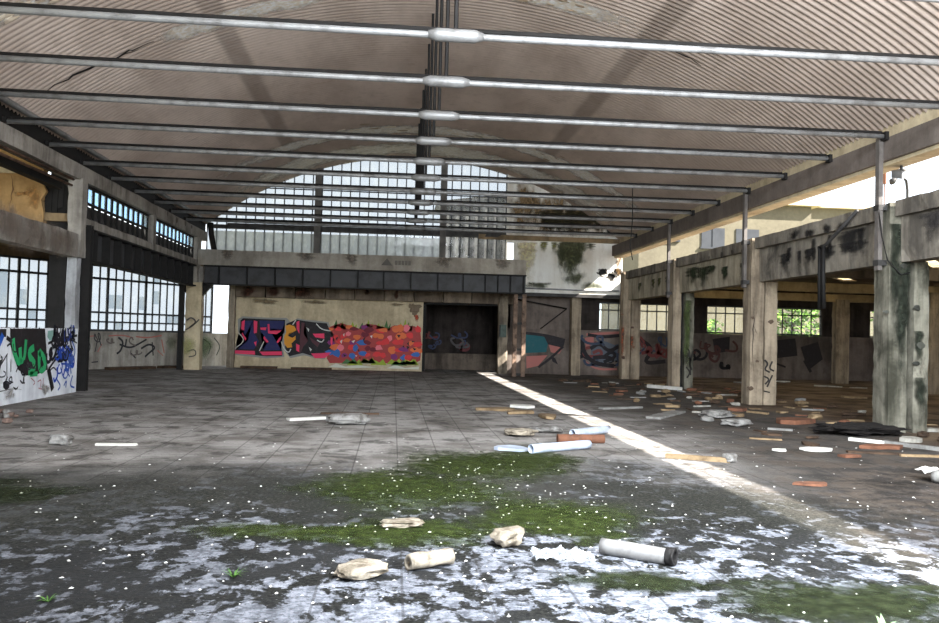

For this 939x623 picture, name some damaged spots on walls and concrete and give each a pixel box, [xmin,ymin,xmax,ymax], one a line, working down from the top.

peeling [0,14,20,25]
crack [116,41,154,58]
crack [48,66,94,90]
water stain [241,126,636,271]
water stain [781,228,868,267]
water stain [686,265,727,286]
water stain [891,224,924,367]
water stain [915,377,926,406]